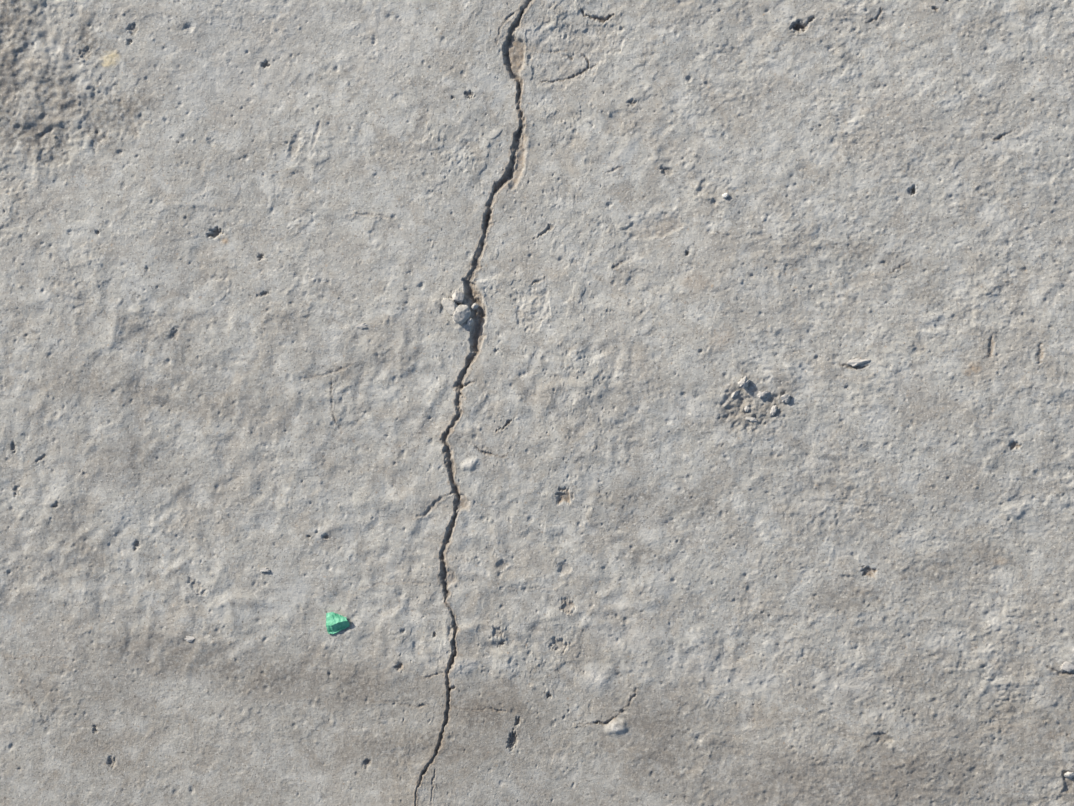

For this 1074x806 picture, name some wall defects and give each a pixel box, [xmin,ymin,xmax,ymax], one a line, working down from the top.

crack [368,0,599,806]